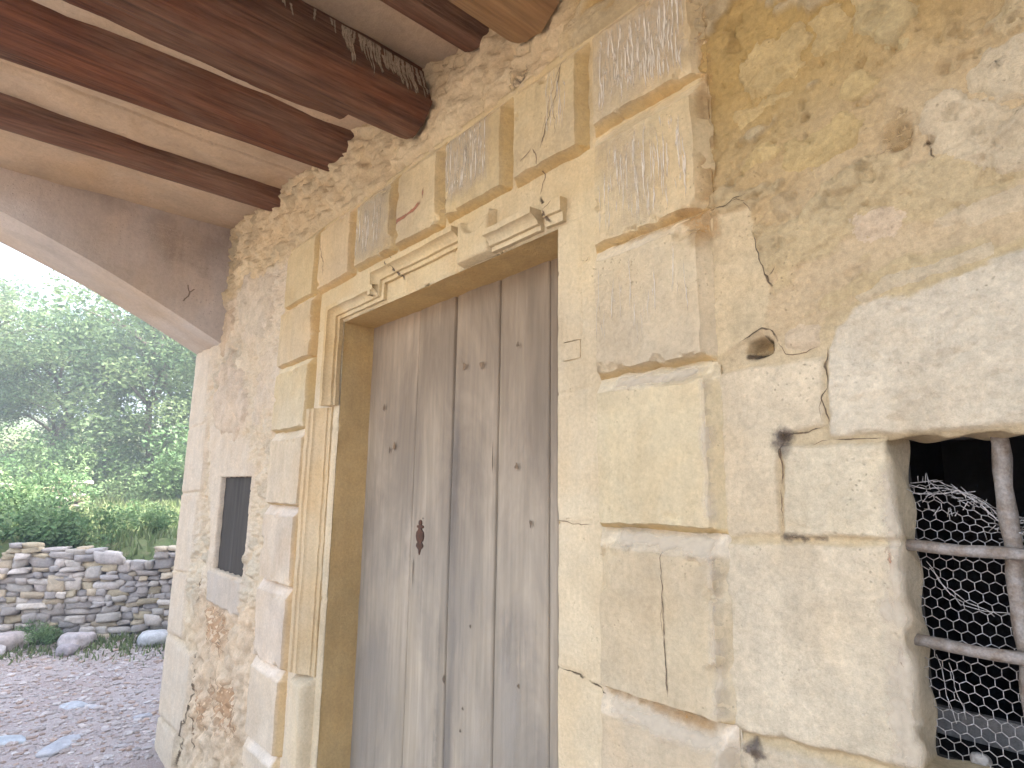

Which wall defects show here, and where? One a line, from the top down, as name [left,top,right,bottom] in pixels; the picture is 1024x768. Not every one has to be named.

crack [521,59,566,221]
crack [754,237,774,285]
leakage [772,429,792,448]
crack [745,327,877,522]
crack [659,552,668,689]
crack [175,656,196,765]
spalling [195,685,235,732]